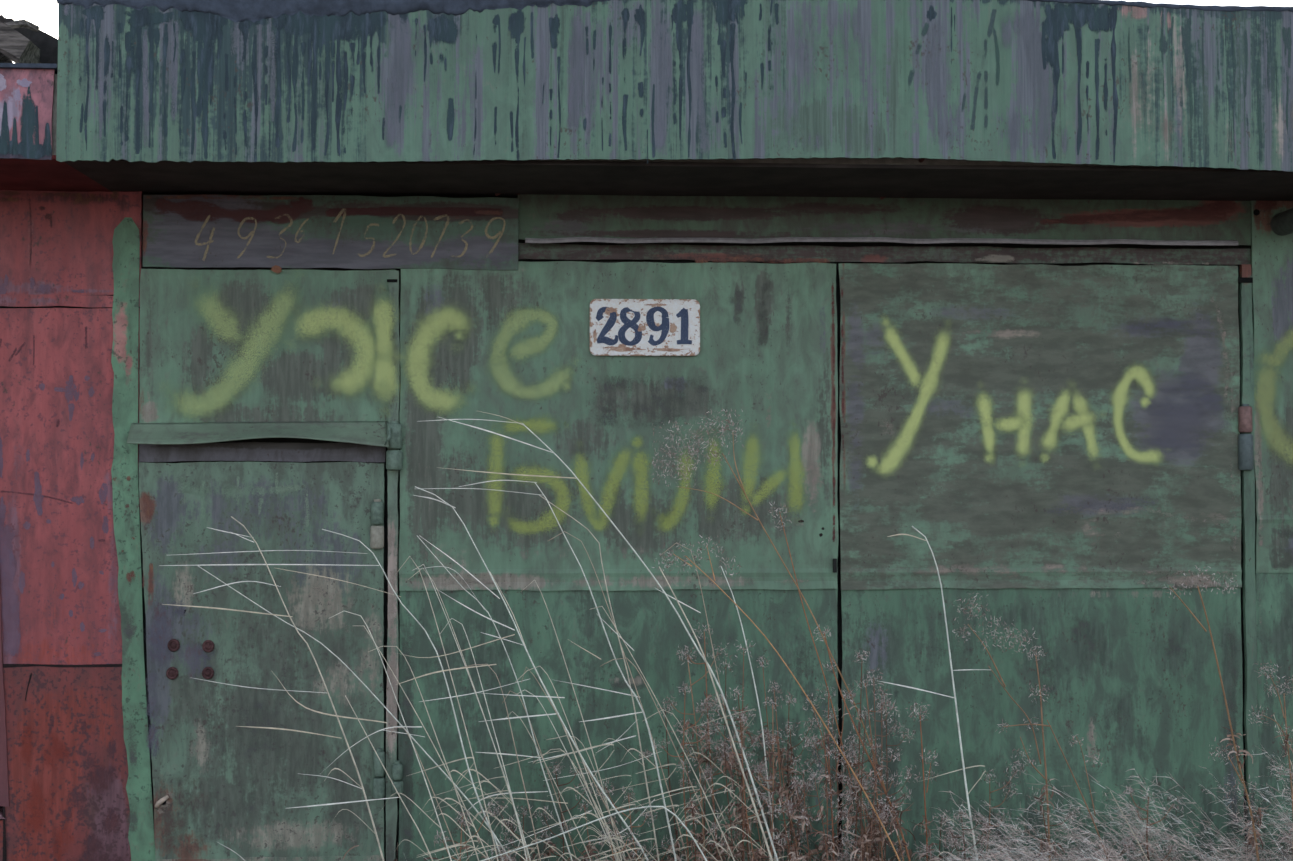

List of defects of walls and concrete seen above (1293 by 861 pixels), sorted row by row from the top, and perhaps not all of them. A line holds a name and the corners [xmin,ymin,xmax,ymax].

peeling [0,74,32,119]
peeling [141,30,149,149]
corrosion [126,563,218,758]